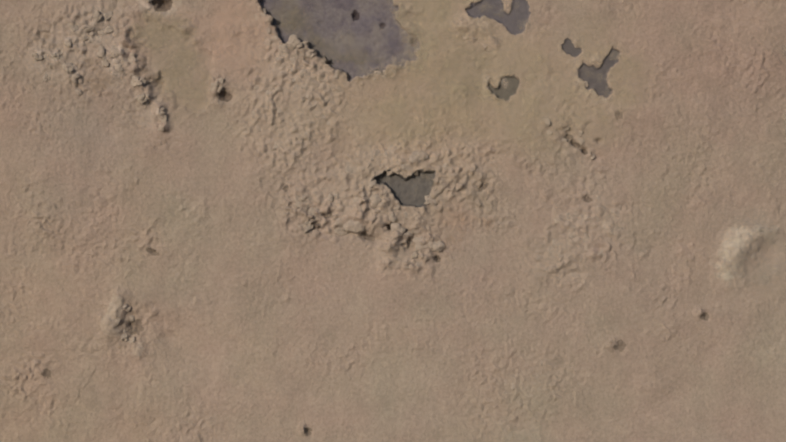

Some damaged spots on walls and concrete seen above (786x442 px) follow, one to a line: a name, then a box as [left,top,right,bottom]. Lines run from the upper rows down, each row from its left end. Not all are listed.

peeling [255,0,422,82]
peeling [454,0,531,50]
peeling [483,75,520,101]
peeling [562,38,620,100]
spalling [267,128,517,278]